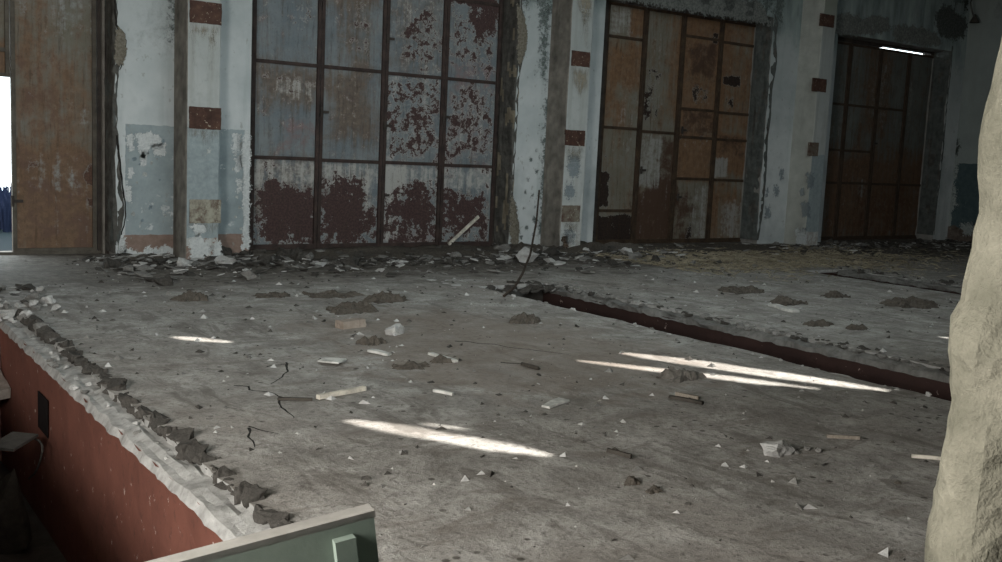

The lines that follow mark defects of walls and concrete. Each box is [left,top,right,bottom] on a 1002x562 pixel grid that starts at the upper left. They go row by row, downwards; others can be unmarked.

spalling [104,0,168,257]
peeling [187,224,223,259]
peeling [231,130,252,251]